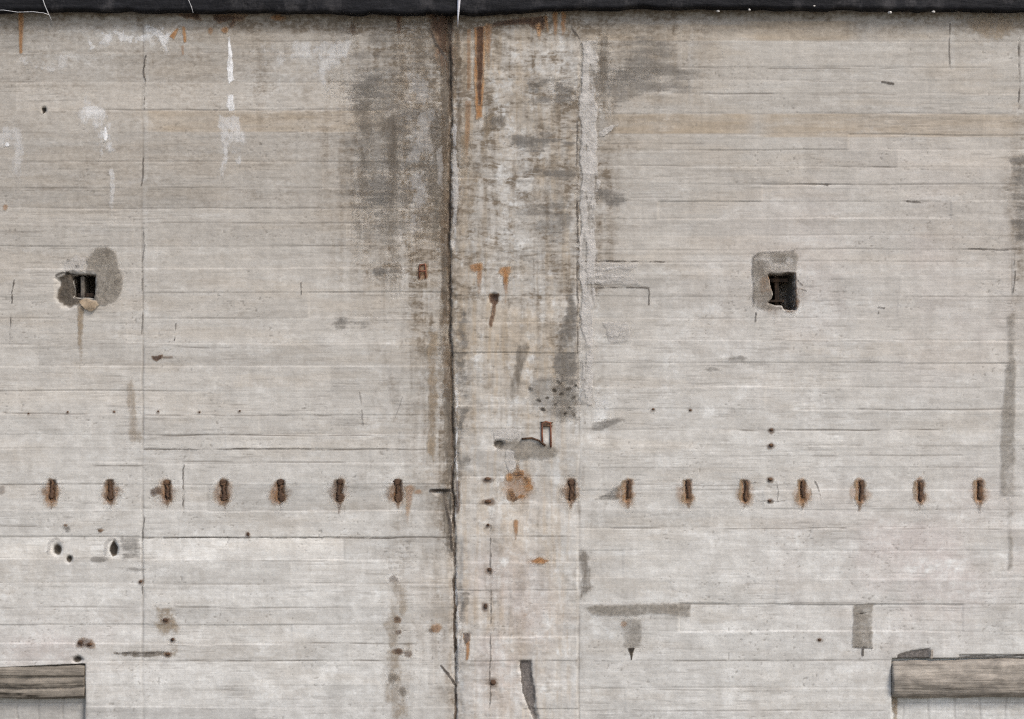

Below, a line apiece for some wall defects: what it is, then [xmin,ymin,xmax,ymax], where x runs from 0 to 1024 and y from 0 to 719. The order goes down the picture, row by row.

rust [465,11,566,135]
damp [512,135,574,152]
spalling [56,256,98,312]
damp [553,295,578,379]
crack [429,16,457,719]
rust [104,479,114,503]
rust [151,481,172,503]
rust [506,465,533,502]